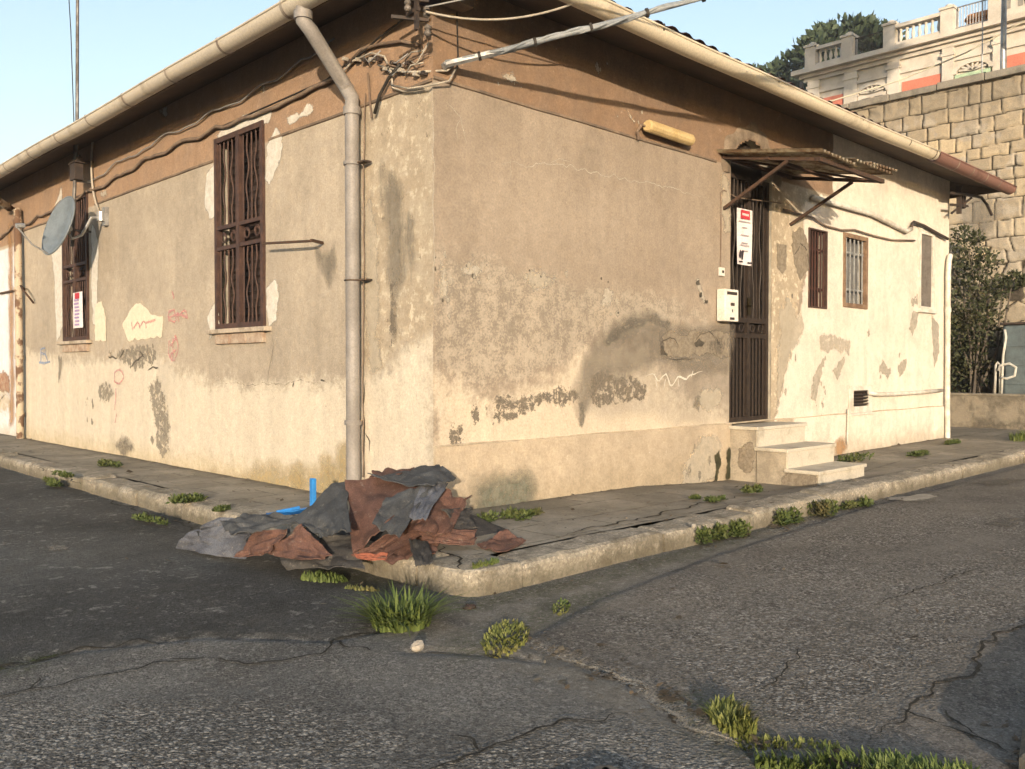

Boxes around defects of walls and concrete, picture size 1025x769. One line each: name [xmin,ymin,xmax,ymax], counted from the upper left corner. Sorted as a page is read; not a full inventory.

damp [386,177,413,346]
peeling [109,344,171,460]
flaking render [449,370,647,446]
peeling [777,294,804,404]
peeling [811,334,850,415]
peeling [879,353,907,379]
peeling [909,294,940,367]